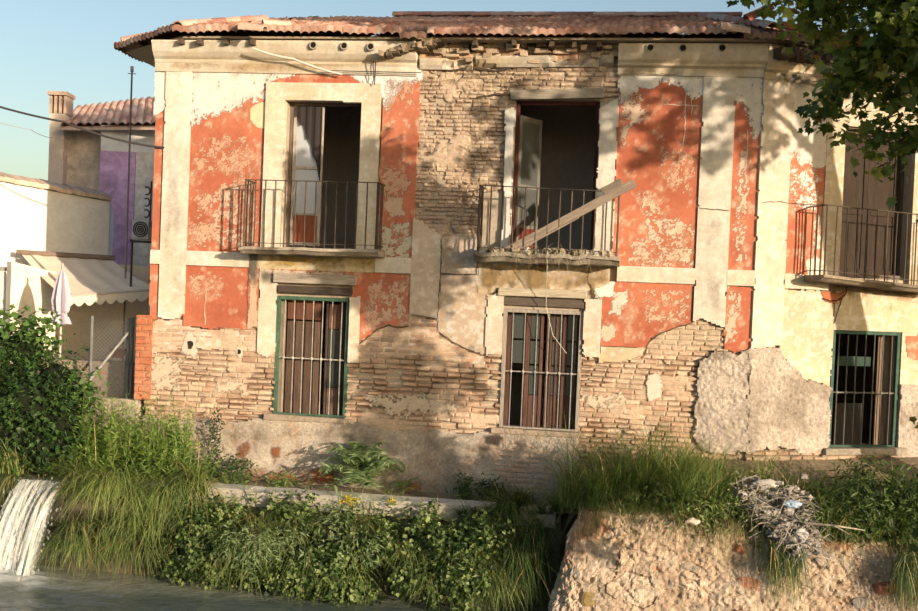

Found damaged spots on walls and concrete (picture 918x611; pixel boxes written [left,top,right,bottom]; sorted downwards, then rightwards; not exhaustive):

peeling [187,134,259,250]
peeling [190,72,295,129]
spalling [351,32,704,268]
peeling [732,150,751,262]
peeling [735,77,763,139]
peeling [790,83,828,275]
spalling [144,268,350,422]
spalling [345,279,502,434]
spalling [577,281,741,470]
spalling [821,291,845,304]
crack [605,550,658,609]